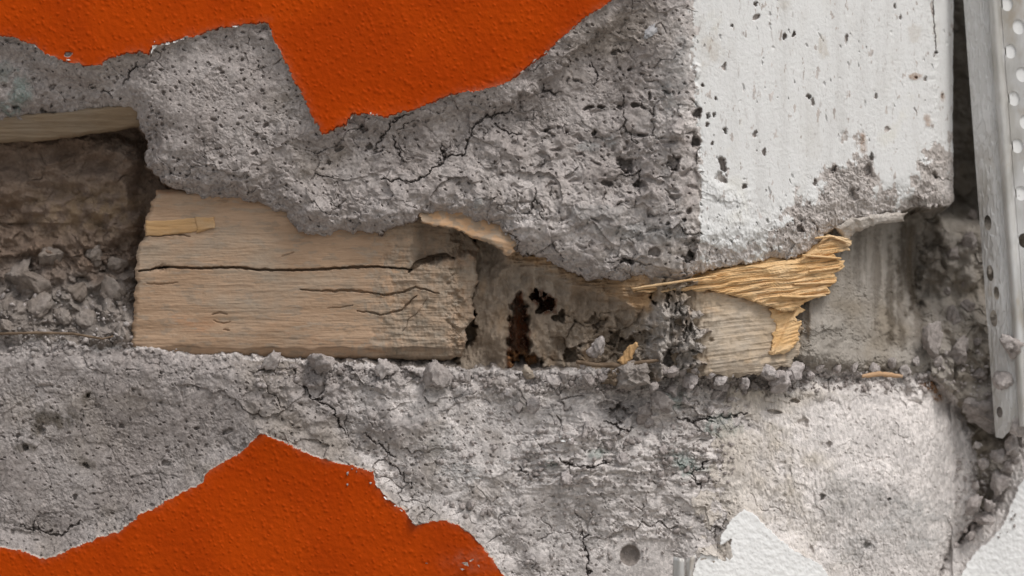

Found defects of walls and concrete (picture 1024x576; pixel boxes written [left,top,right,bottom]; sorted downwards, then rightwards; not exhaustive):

spalling [0,0,702,282]
crack [374,109,518,183]
peeling [693,145,704,166]
peeling [695,133,954,274]
corrosion [507,291,556,368]
crack [303,386,413,489]
spalling [0,237,1024,576]
crack [559,458,611,469]
crack [677,458,708,489]
crack [677,413,748,424]
crack [20,520,81,537]
crack [580,531,593,575]